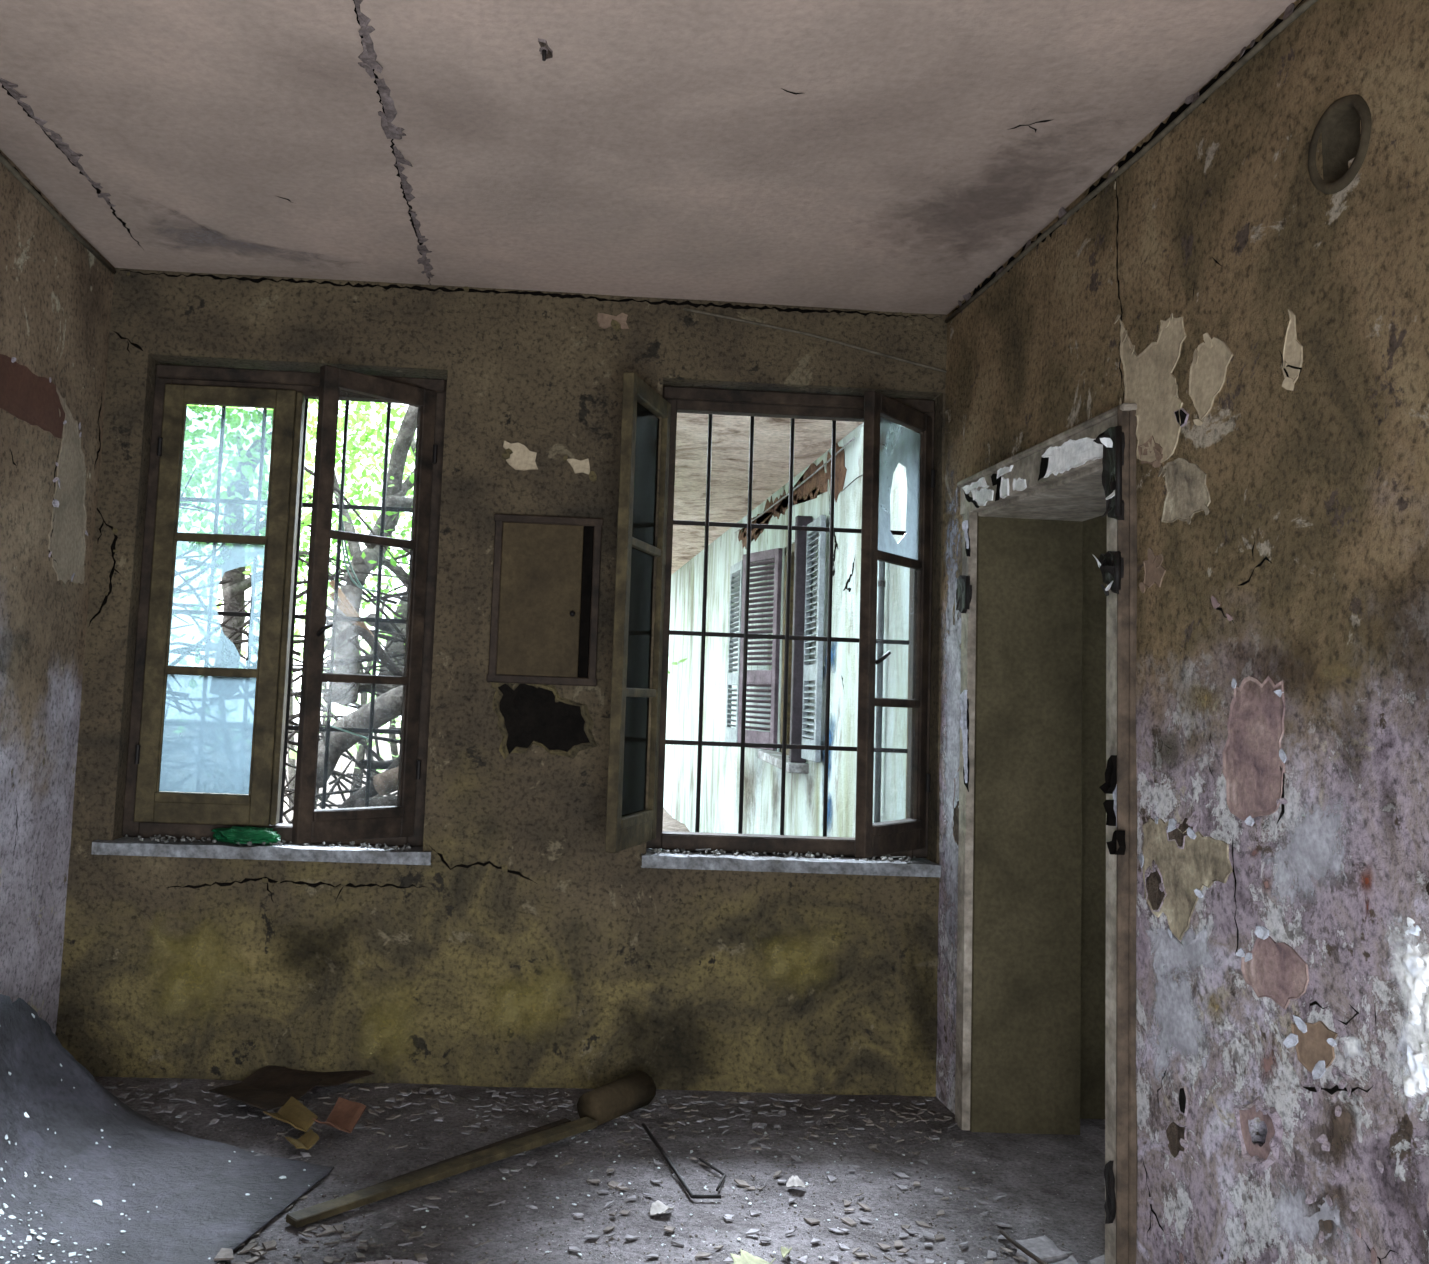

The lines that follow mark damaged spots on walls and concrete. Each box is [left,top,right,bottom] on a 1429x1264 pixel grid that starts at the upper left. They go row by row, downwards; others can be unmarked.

crack [0,0,1304,404]
peeling [962,431,1115,557]
peeling [1119,313,1233,524]
peeling [1279,309,1303,391]
spalling [1165,1086,1188,1161]
peeling [1233,926,1360,1256]